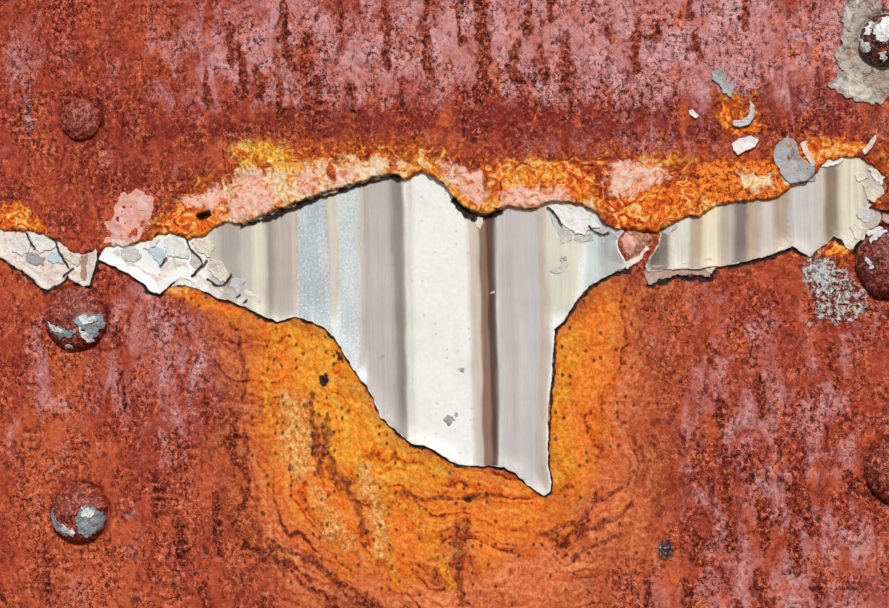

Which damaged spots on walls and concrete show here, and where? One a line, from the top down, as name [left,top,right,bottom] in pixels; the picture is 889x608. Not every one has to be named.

rust [224,21,294,124]
rust [139,134,797,243]
rust [472,0,493,103]
rust [504,0,557,87]
peeling [711,67,735,98]
rust [708,86,768,139]
peeling [732,101,759,155]
rust [787,133,889,176]
peeling [827,0,889,105]
peeling [0,135,889,496]
rust [167,277,675,608]
peeling [51,504,108,538]